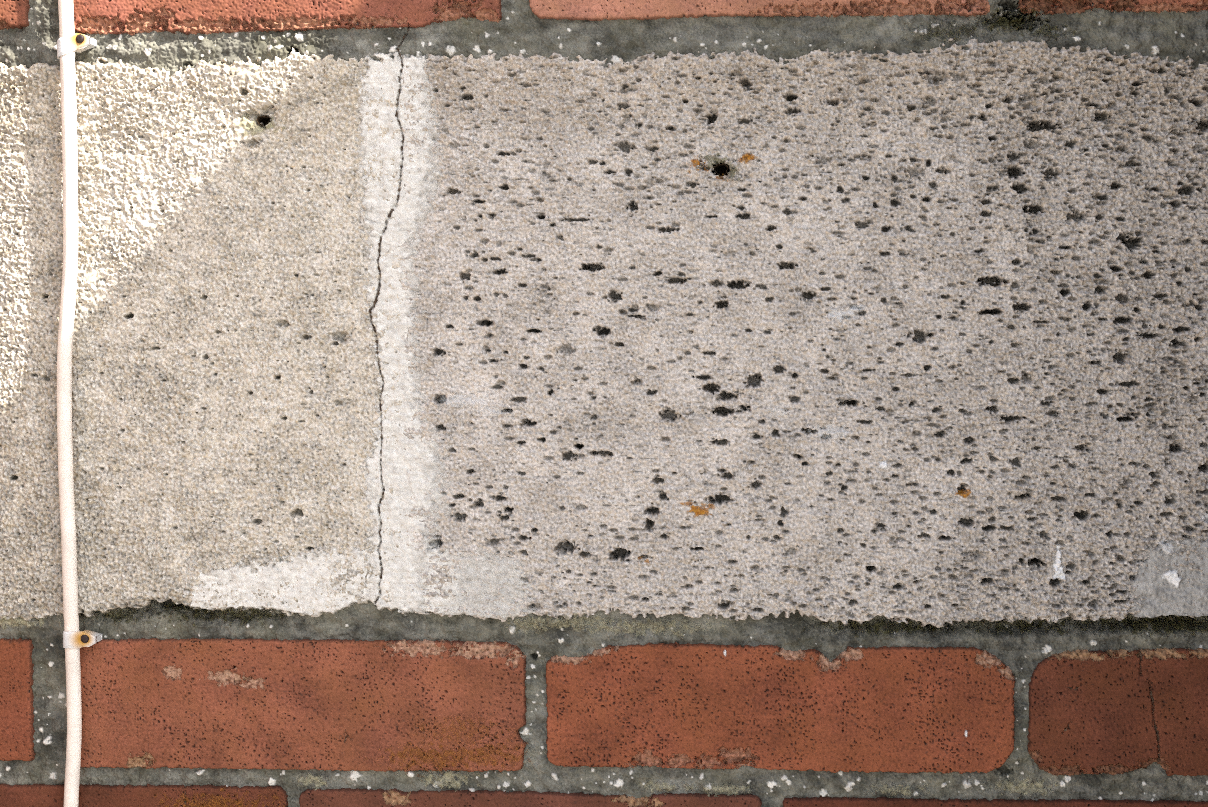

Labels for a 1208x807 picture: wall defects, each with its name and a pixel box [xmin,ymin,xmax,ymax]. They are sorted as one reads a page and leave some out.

crack [369,3,437,603]